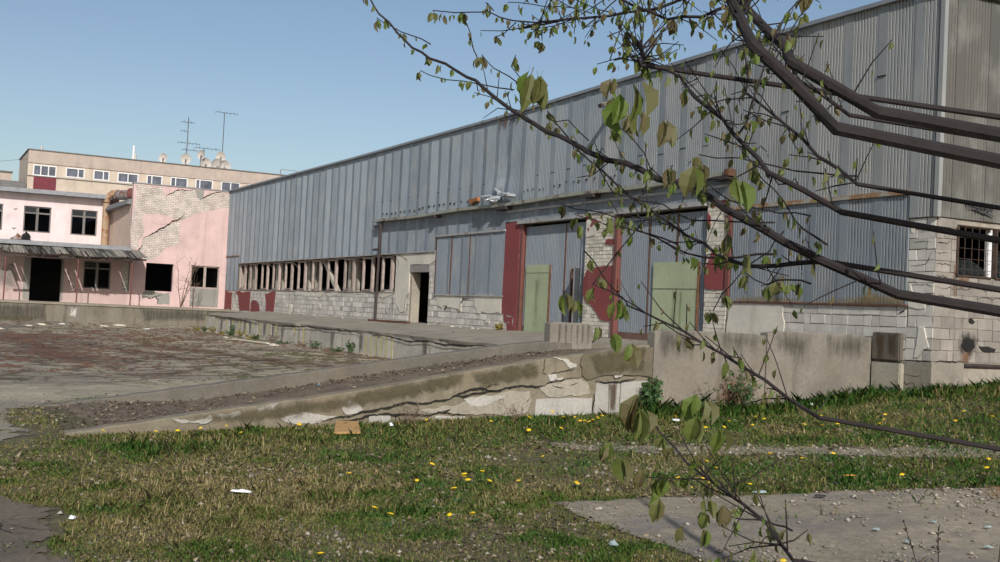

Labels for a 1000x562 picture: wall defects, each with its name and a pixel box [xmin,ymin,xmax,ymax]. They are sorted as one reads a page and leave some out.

peeling [130,184,230,260]
peeling [224,290,276,312]
peeling [379,252,436,312]
peeling [583,265,613,321]
peeling [704,252,726,290]
crack [318,362,635,422]